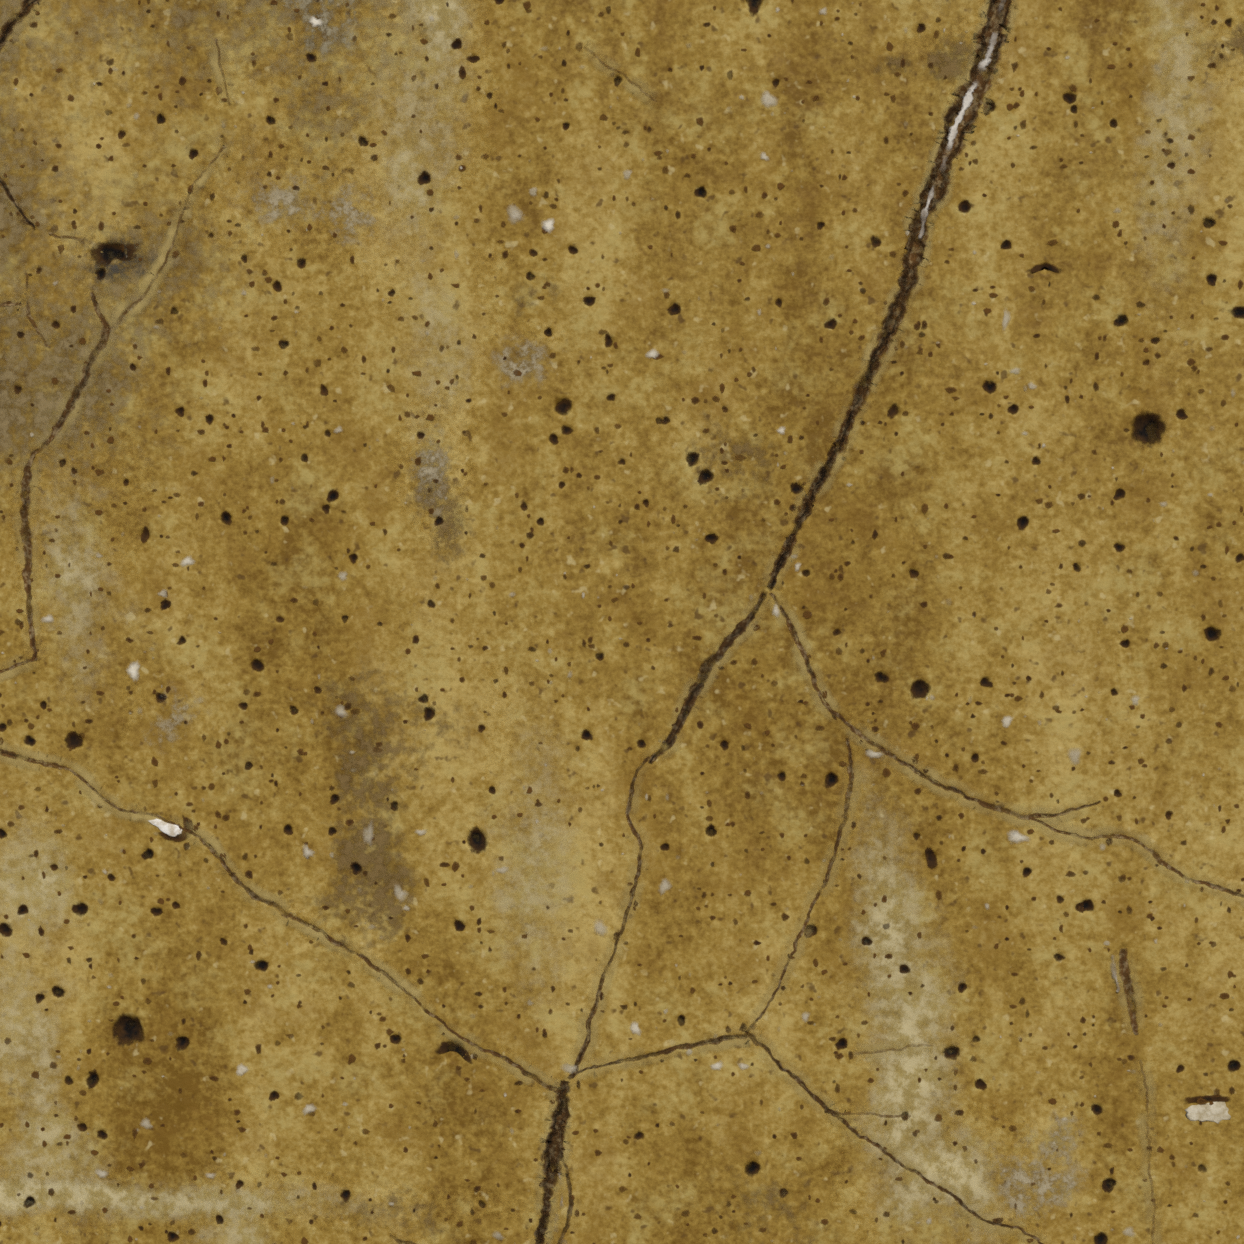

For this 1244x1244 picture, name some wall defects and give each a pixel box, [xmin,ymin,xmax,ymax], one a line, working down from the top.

crack [0,0,39,49]
crack [211,39,222,82]
crack [0,178,78,240]
crack [196,171,210,186]
crack [0,226,176,680]
crack [608,0,1244,964]
crack [0,743,1043,1244]
crack [1113,949,1138,1035]